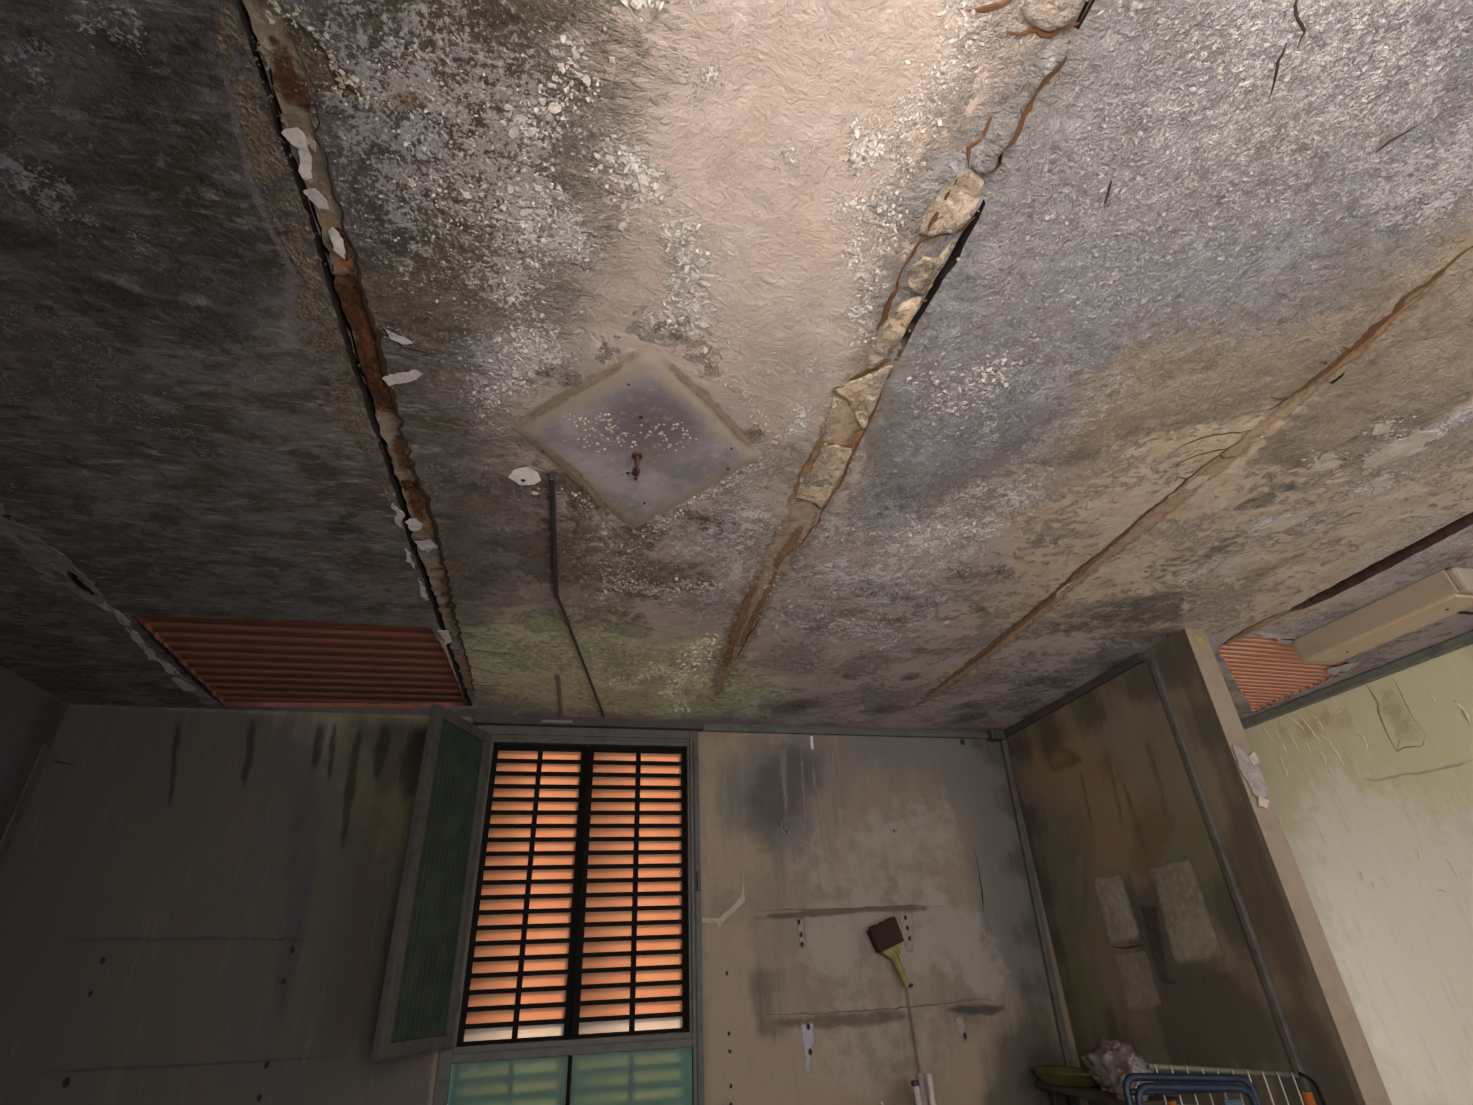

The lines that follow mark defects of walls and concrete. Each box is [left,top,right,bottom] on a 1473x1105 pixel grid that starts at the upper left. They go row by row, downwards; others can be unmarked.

crack [237,0,516,706]
crack [790,0,1095,561]
crack [1101,180,1112,208]
crack [962,246,1473,670]